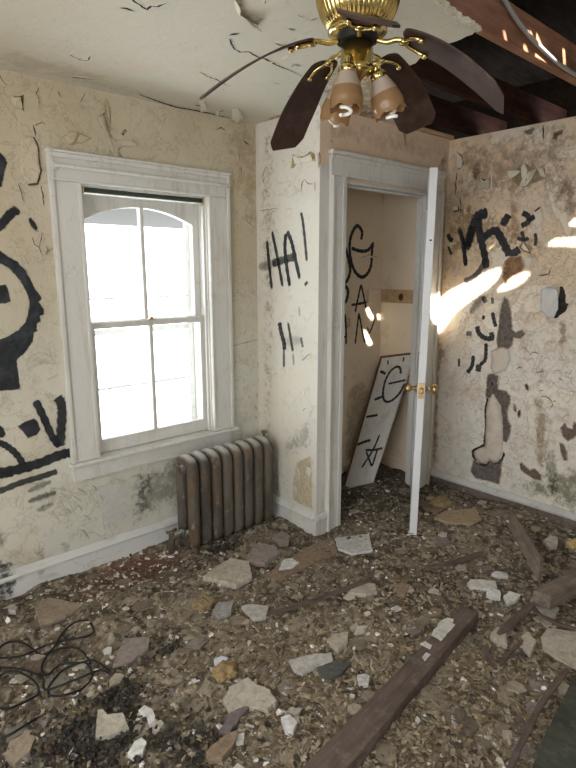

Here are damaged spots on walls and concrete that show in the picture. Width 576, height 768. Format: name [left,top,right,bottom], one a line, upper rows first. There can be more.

flaking render [434,0,482,33]
crack [229,14,318,97]
crack [31,54,96,137]
crack [138,94,227,132]
peeling [507,163,546,187]
flaking render [502,242,533,285]
flaking render [470,296,526,485]
peeling [293,456,312,508]
mould [536,474,576,507]